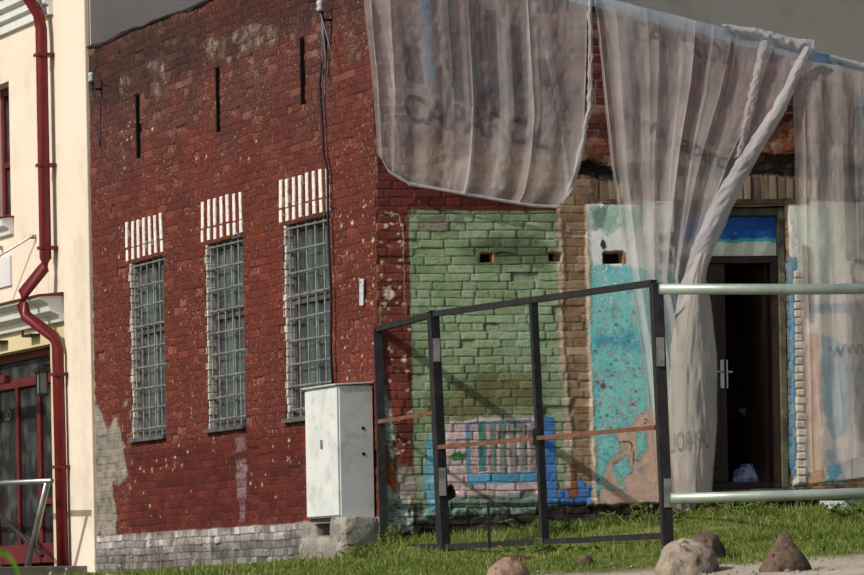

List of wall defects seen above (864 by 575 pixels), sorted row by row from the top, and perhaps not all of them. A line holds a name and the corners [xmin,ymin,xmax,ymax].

spalling [573,131,740,183]
spalling [750,113,864,182]
leakage [444,309,542,418]
peeling [339,156,676,537]